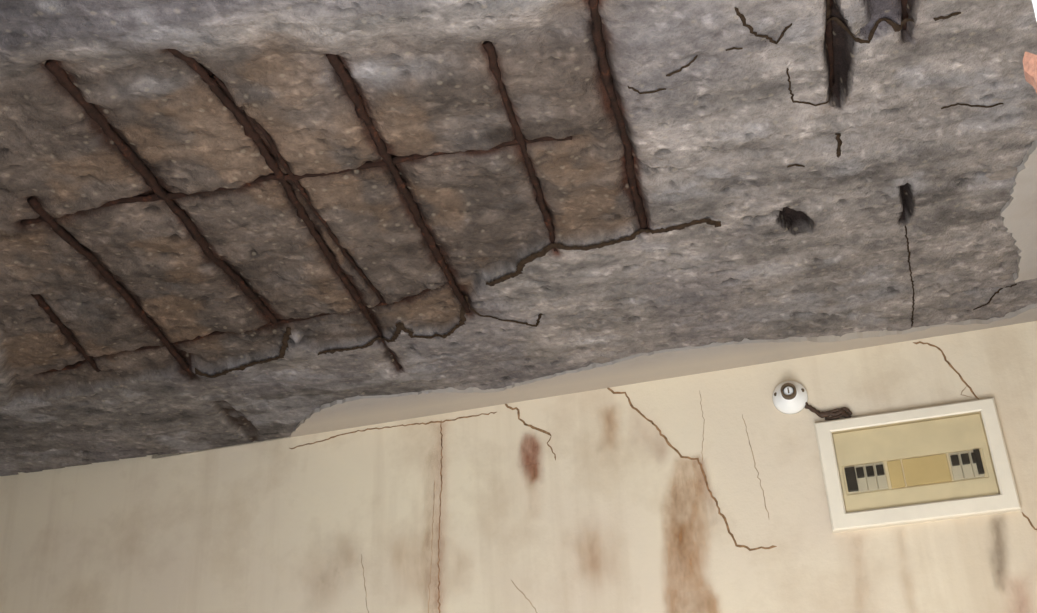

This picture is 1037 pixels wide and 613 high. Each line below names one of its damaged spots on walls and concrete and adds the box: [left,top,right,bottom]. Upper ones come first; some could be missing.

crack [726,7,792,51]
crack [826,0,961,44]
crack [628,55,698,94]
crack [786,69,830,106]
crack [941,102,1003,110]
crack [834,133,842,158]
peeling [0,0,1037,476]
crack [905,225,979,399]
corrosion [523,439,538,479]
crack [607,388,777,551]
crack [290,404,556,613]